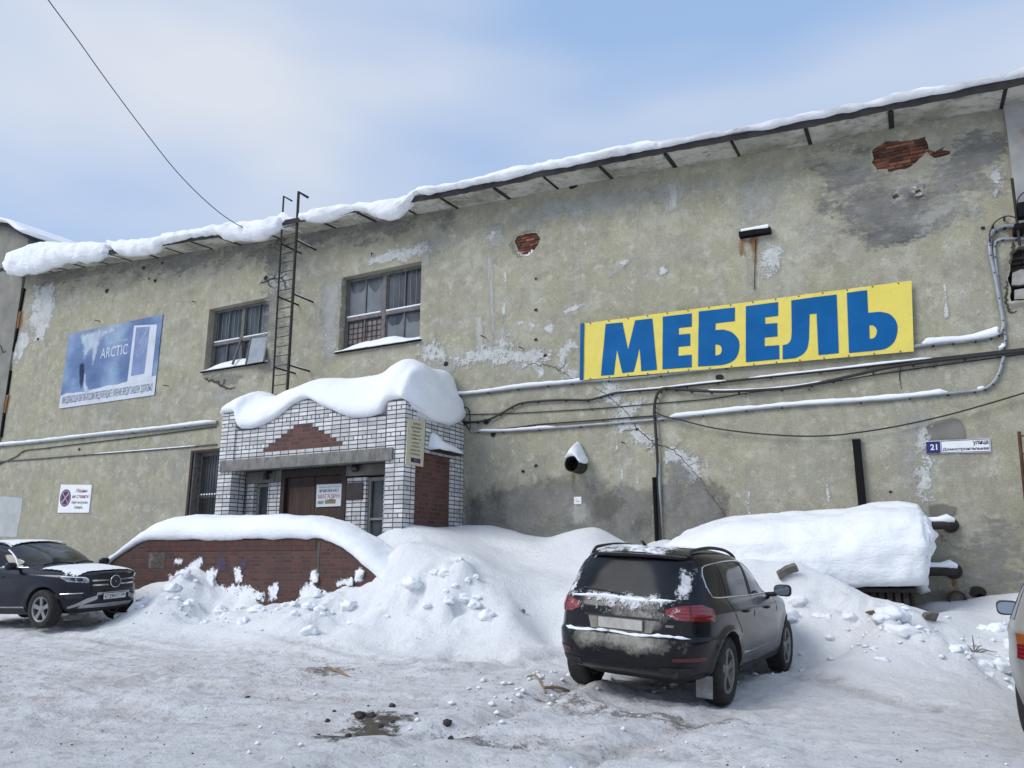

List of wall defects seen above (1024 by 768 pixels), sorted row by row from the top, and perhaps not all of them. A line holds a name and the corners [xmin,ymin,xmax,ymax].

flaking render [872,137,959,208]
peeling [368,235,450,267]
flaking render [510,230,540,257]
peeling [756,238,784,280]
leakage [842,193,960,247]
peeling [12,281,57,364]
peeling [416,303,591,379]
crack [529,361,725,516]
peeling [901,412,941,504]